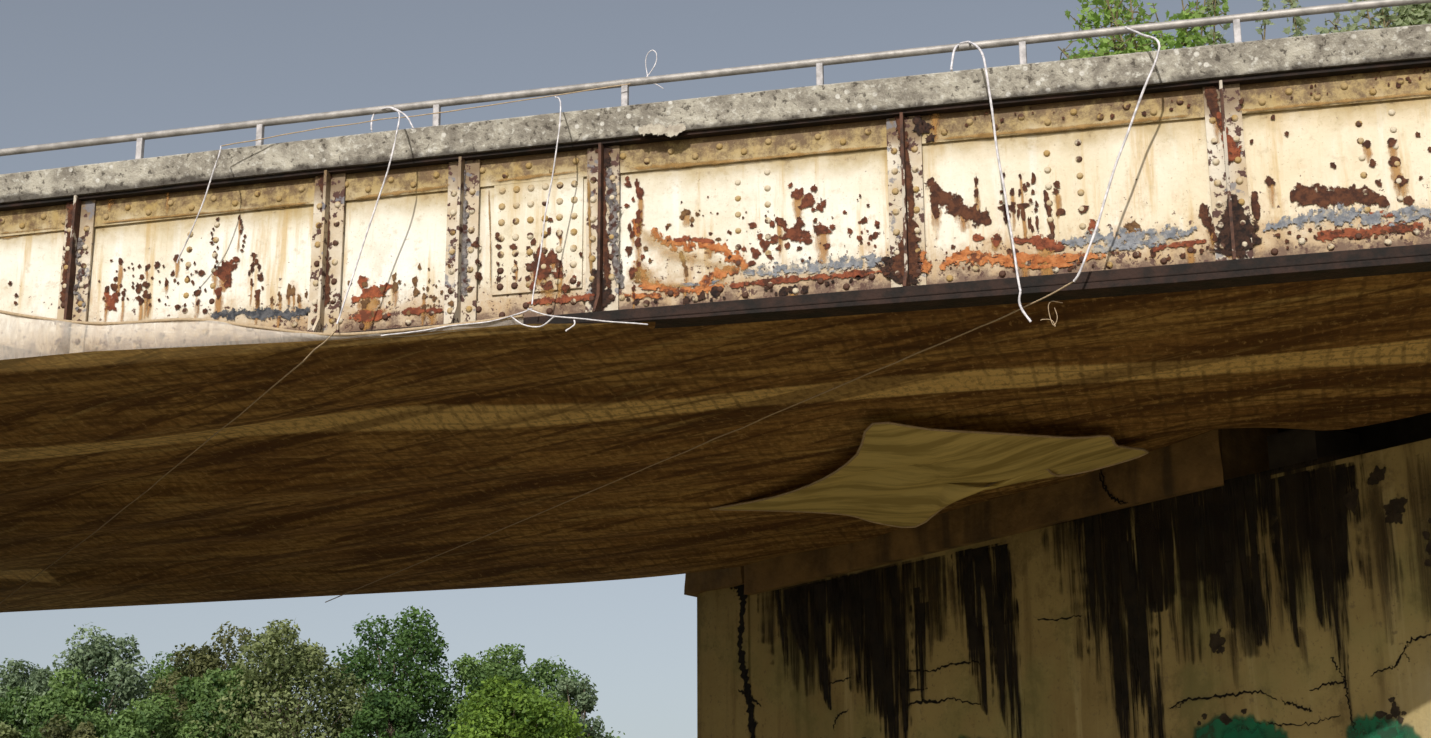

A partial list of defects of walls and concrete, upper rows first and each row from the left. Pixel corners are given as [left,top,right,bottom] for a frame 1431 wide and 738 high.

rust [104,174,332,322]
rust [348,275,443,328]
rust [356,113,1188,307]
rust [1152,191,1262,263]
rust [1290,138,1424,242]
crack [730,584,761,738]
crack [831,677,866,738]
damp [758,543,1022,738]
damp [1042,448,1395,738]
crack [1170,634,1431,728]